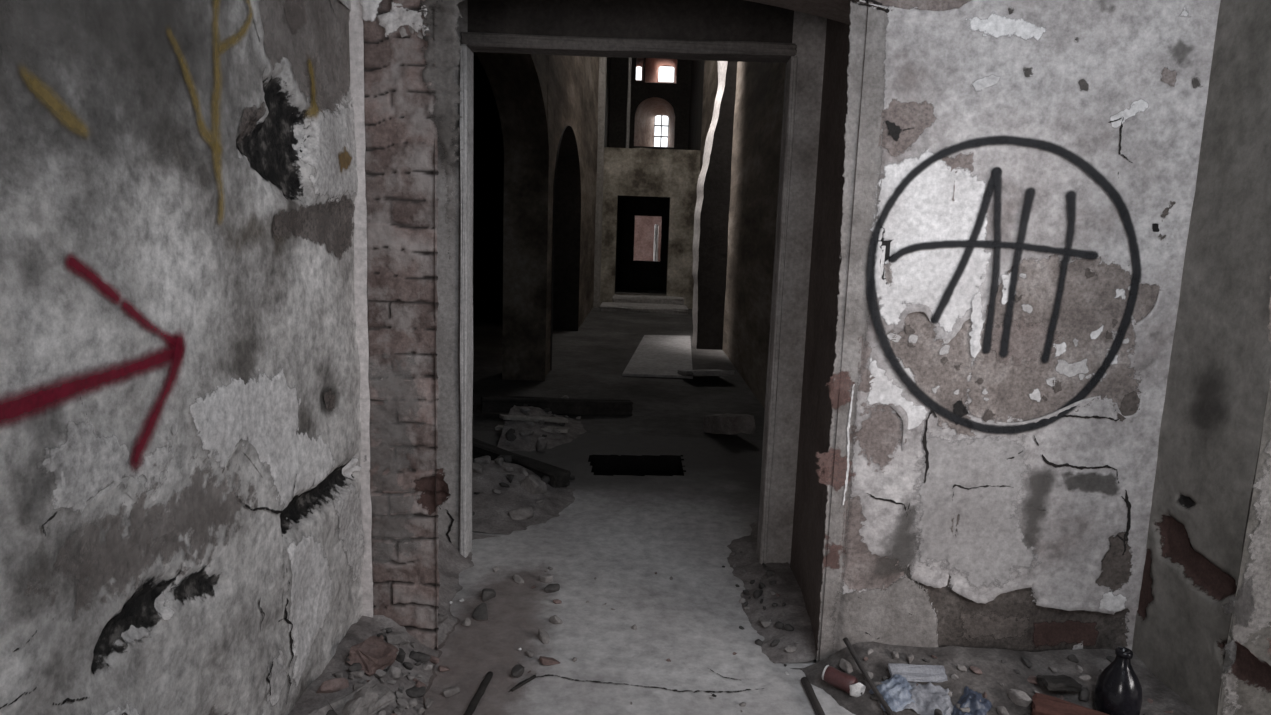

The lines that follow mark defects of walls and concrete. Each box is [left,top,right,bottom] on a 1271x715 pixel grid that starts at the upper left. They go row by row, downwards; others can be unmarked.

spalling [236,0,355,260]
spalling [816,0,1237,663]
spalling [54,440,362,674]
spalling [414,468,451,515]
crack [867,410,1014,513]
damp [1023,471,1118,551]
crack [1034,436,1131,555]
crack [1064,410,1120,421]
spalling [1217,639,1271,693]